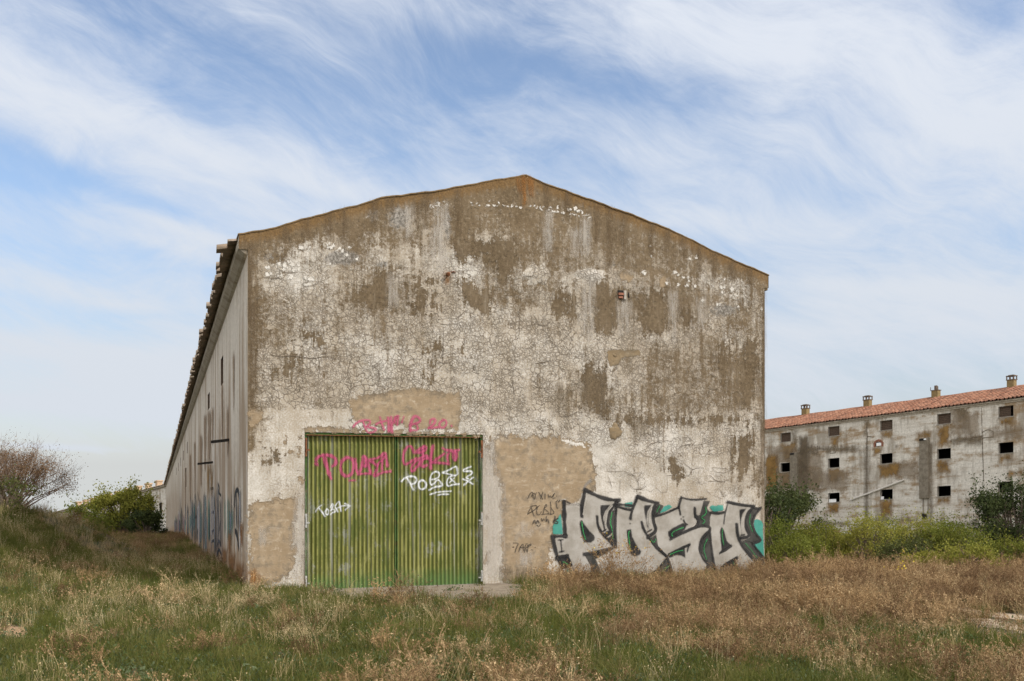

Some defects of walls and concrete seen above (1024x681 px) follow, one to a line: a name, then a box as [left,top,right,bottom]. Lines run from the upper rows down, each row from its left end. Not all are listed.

crack [257,347,393,394]
crack [439,309,582,423]
spalling [246,336,598,587]
crack [608,437,762,499]
water stain [792,433,868,524]
water stain [951,436,982,444]